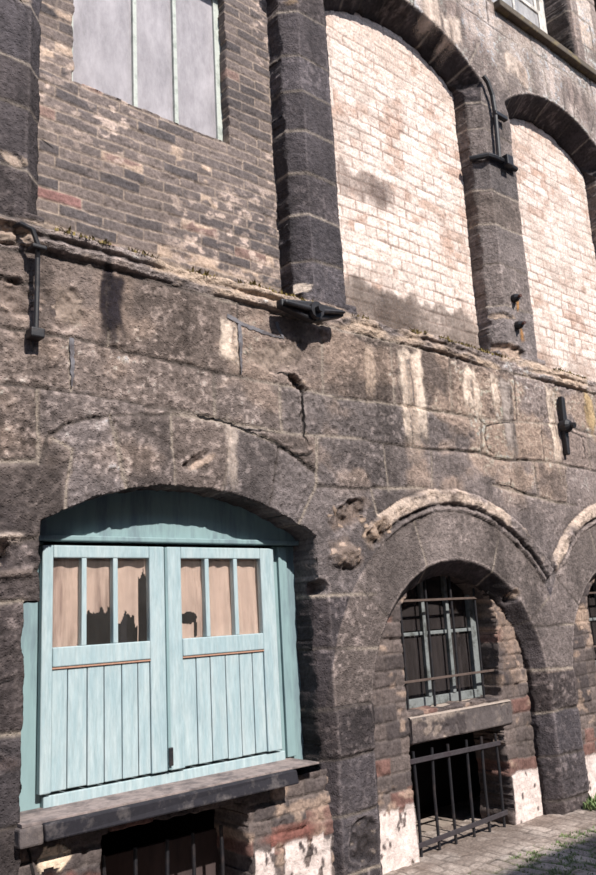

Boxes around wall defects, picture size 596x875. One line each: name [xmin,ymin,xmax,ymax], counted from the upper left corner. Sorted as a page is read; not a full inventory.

crack [197,372,315,470]
peeling [512,768,543,825]
peeling [255,823,332,875]
peeling [350,804,420,874]